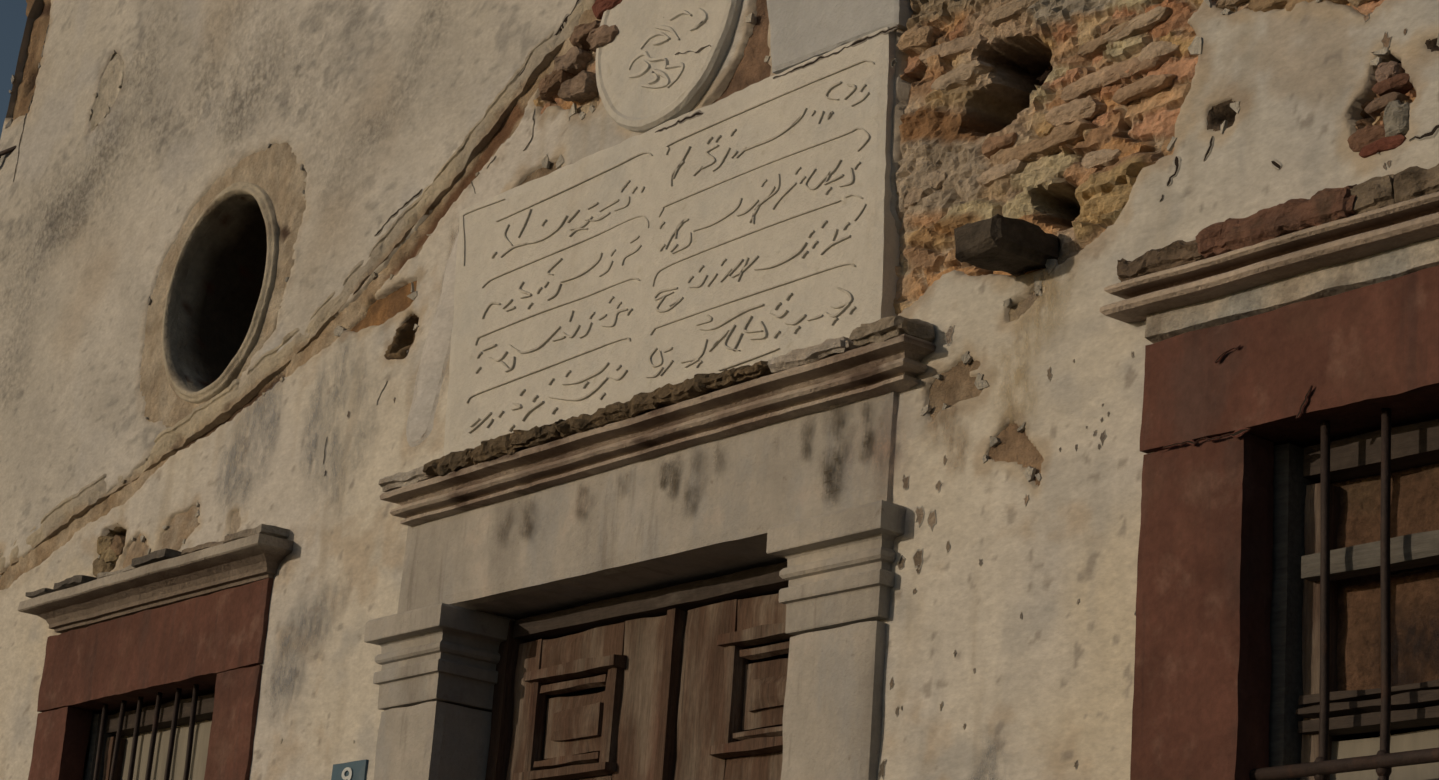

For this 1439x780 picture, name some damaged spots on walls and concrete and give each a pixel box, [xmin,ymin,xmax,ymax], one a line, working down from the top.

spalling [1425,33,1439,52]
spalling [893,0,1384,322]
spalling [1347,48,1416,170]
crack [1409,123,1439,141]
spalling [0,0,622,590]
peeling [920,325,989,420]
peeling [982,421,1044,506]
flaking render [1086,403,1110,450]